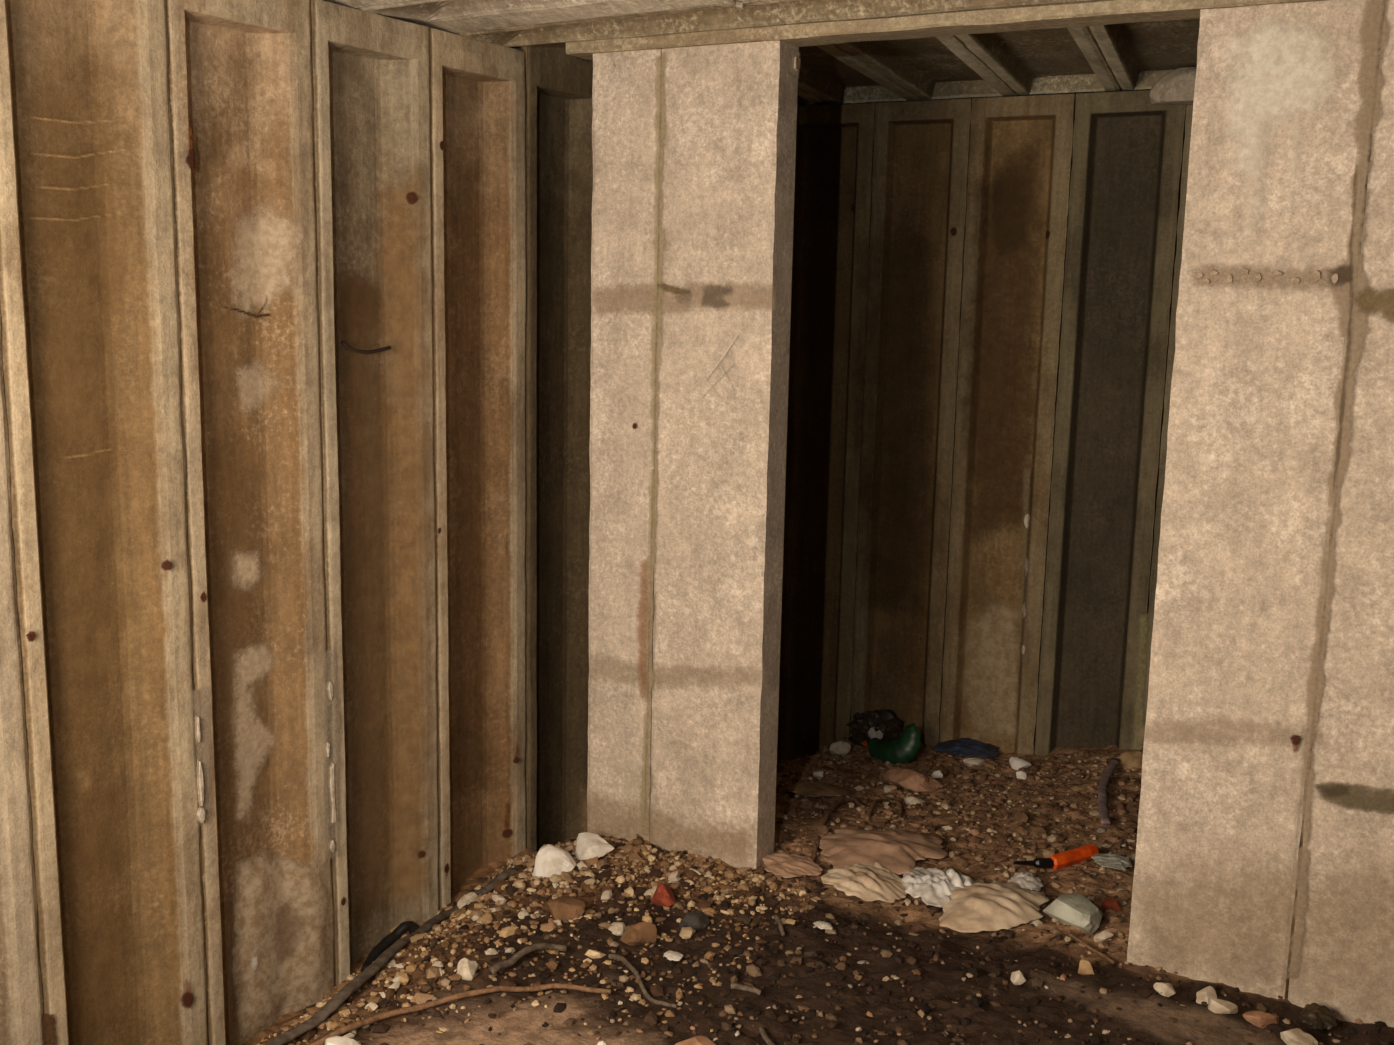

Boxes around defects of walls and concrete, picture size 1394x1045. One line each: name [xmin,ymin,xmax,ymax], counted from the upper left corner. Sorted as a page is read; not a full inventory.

corrosion [186,127,195,170]
water stain [232,210,303,312]
water stain [703,286,730,307]
water stain [966,158,1035,529]
water stain [237,366,269,408]
crack [1287,0,1394,978]
water stain [235,554,259,585]
water stain [234,646,273,819]
water stain [1317,783,1394,814]
corrosion [182,980,193,1008]